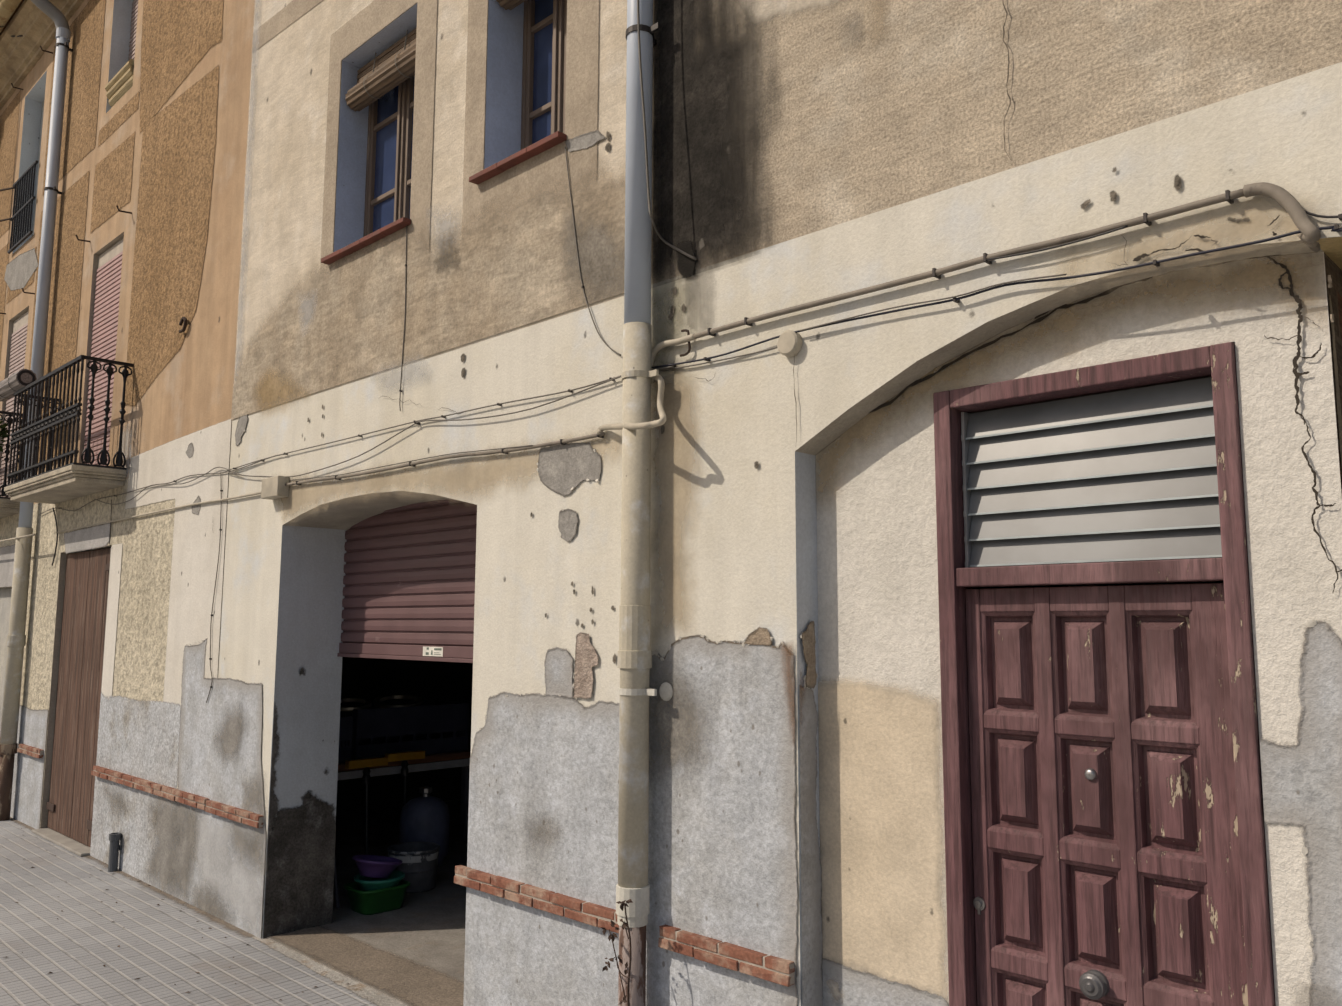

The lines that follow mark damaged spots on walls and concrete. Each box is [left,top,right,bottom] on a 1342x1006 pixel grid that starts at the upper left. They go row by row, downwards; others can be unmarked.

water stain [651,0,761,342]
spalling [537,442,601,542]
crack [869,214,1342,592]
flaking render [1327,274,1342,464]
peeling [90,638,266,938]
peeling [463,887,619,1006]
peeling [467,586,620,910]
peeling [646,621,949,1006]
peeling [1259,621,1342,1006]